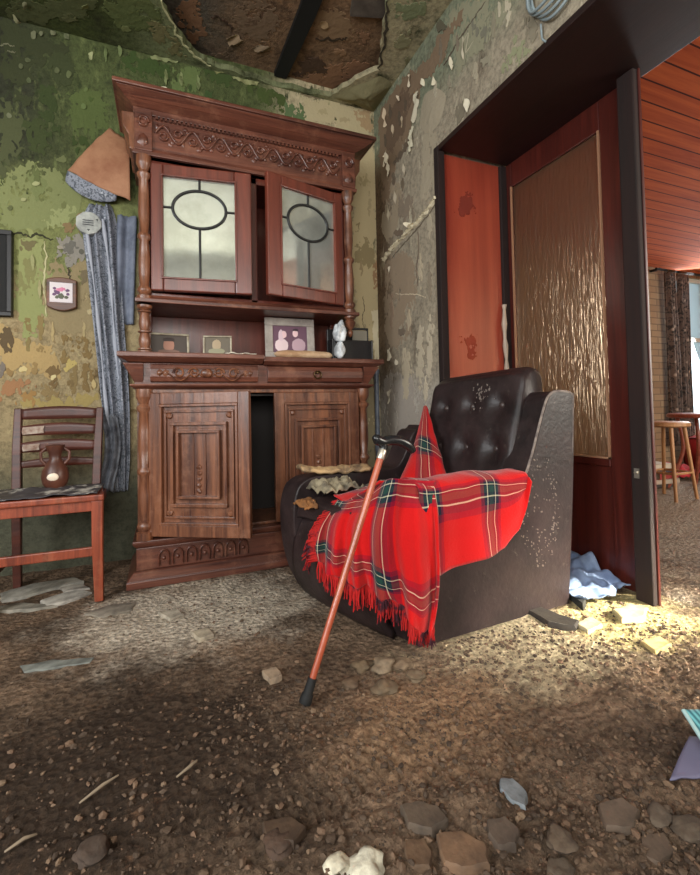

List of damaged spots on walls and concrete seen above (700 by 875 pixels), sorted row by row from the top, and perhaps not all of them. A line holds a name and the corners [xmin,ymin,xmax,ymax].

peeling [227,34,271,52]
peeling [150,55,183,86]
peeling [215,71,259,85]
spalling [292,56,328,78]
damp [247,84,286,113]
spalling [304,8,464,365]
damp [0,0,170,408]
peeling [51,358,77,380]